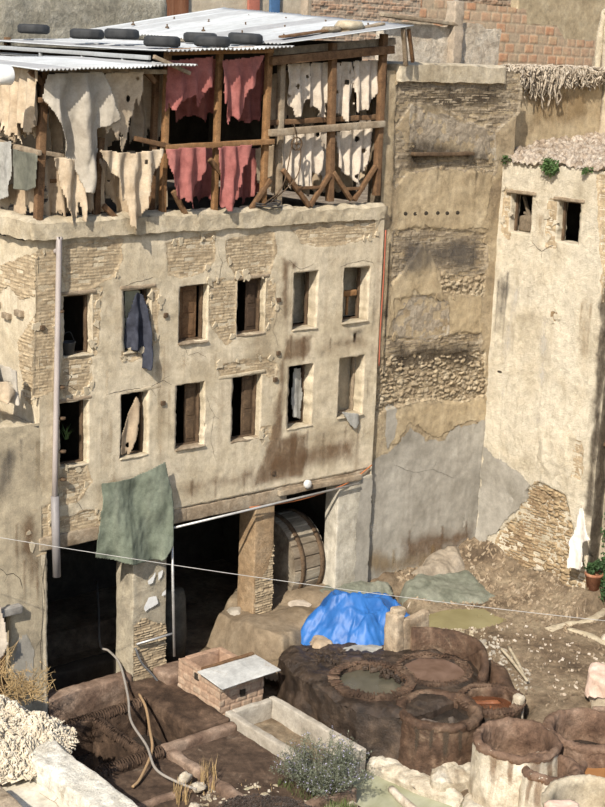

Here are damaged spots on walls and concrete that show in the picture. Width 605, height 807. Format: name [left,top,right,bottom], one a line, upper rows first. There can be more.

spalling [166,231,279,345]
water stain [406,243,476,269]
spalling [596,174,605,302]
water stain [284,337,309,359]
water stain [256,392,350,483]
water stain [585,288,605,563]
spalling [33,464,102,537]